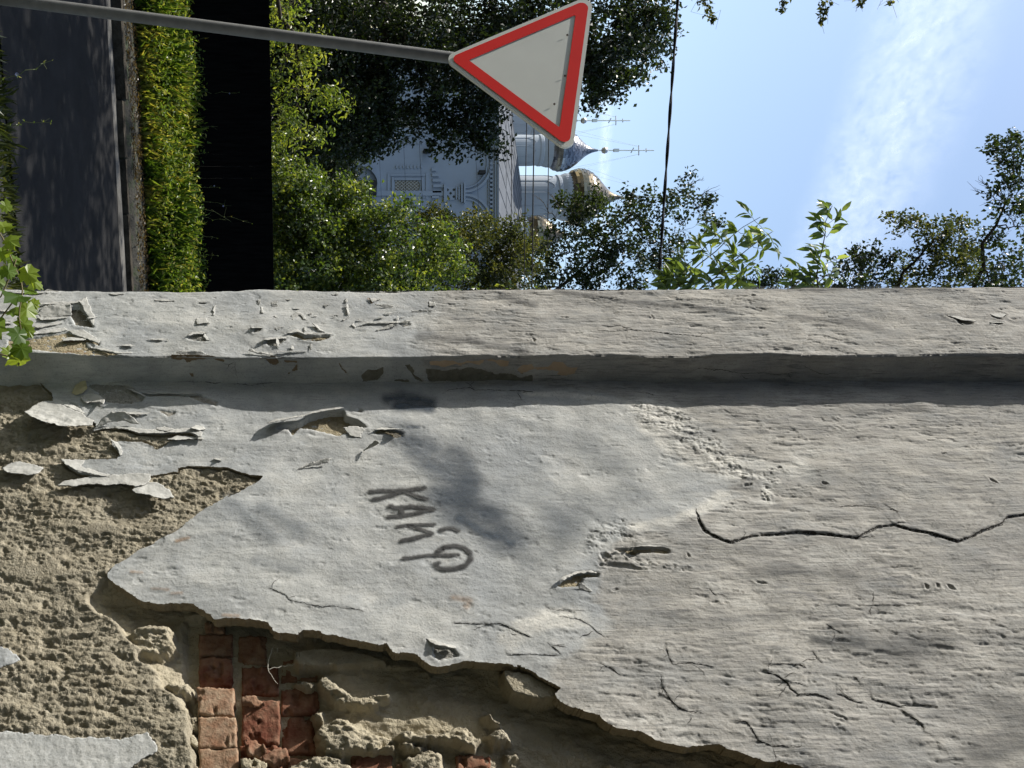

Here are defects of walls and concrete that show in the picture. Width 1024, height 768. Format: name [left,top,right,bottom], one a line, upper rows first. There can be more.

peeling [14,289,135,357]
peeling [170,306,224,377]
peeling [249,293,436,374]
crack [695,505,1024,544]
spalling [0,383,803,768]
crack [657,647,714,724]
crack [768,624,939,728]
crack [740,721,802,764]